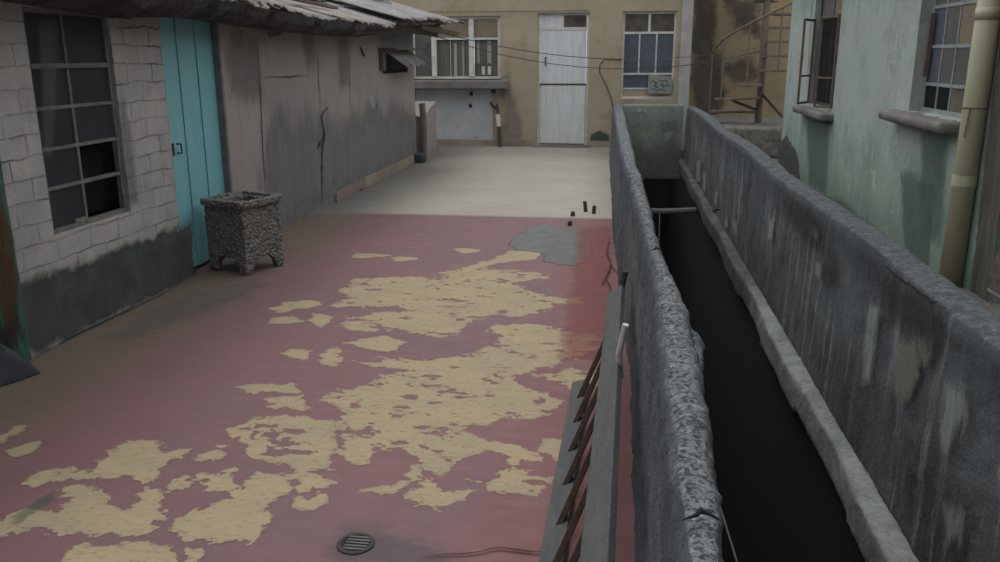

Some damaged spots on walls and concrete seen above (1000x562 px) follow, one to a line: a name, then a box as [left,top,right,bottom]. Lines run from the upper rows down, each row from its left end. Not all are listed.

crack [257,44,328,195]
corrosion [0,191,19,347]
leakage [0,223,196,358]
peeling [0,248,602,562]